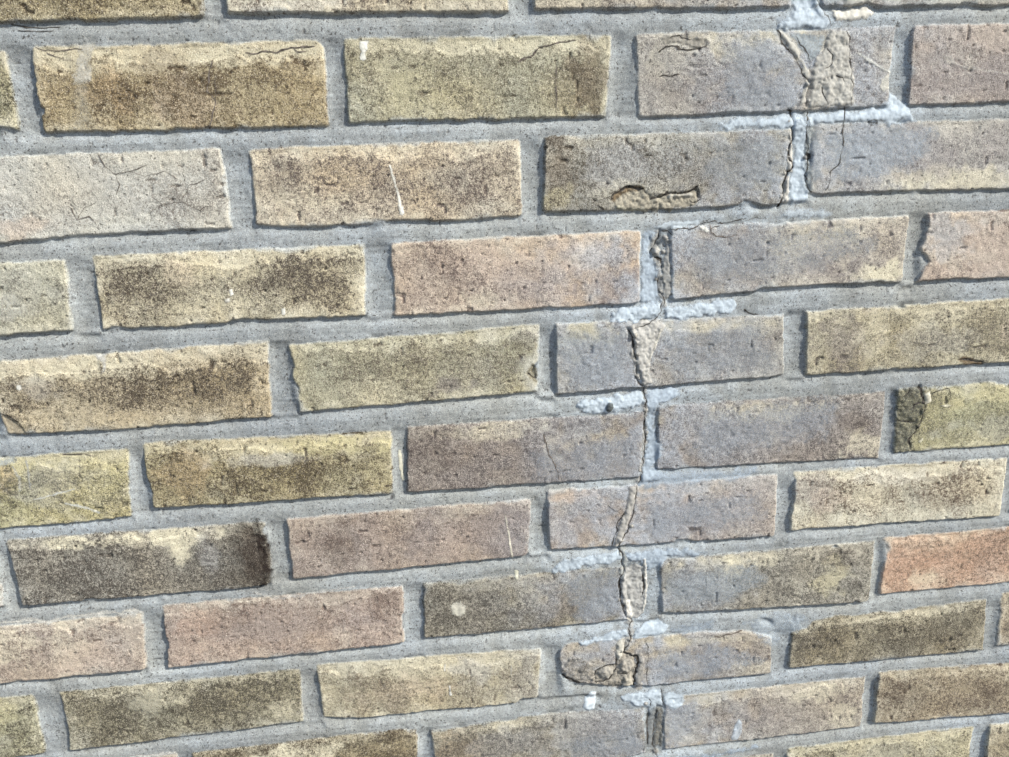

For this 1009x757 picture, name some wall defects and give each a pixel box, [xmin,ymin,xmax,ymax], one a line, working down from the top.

crack [608,4,854,755]